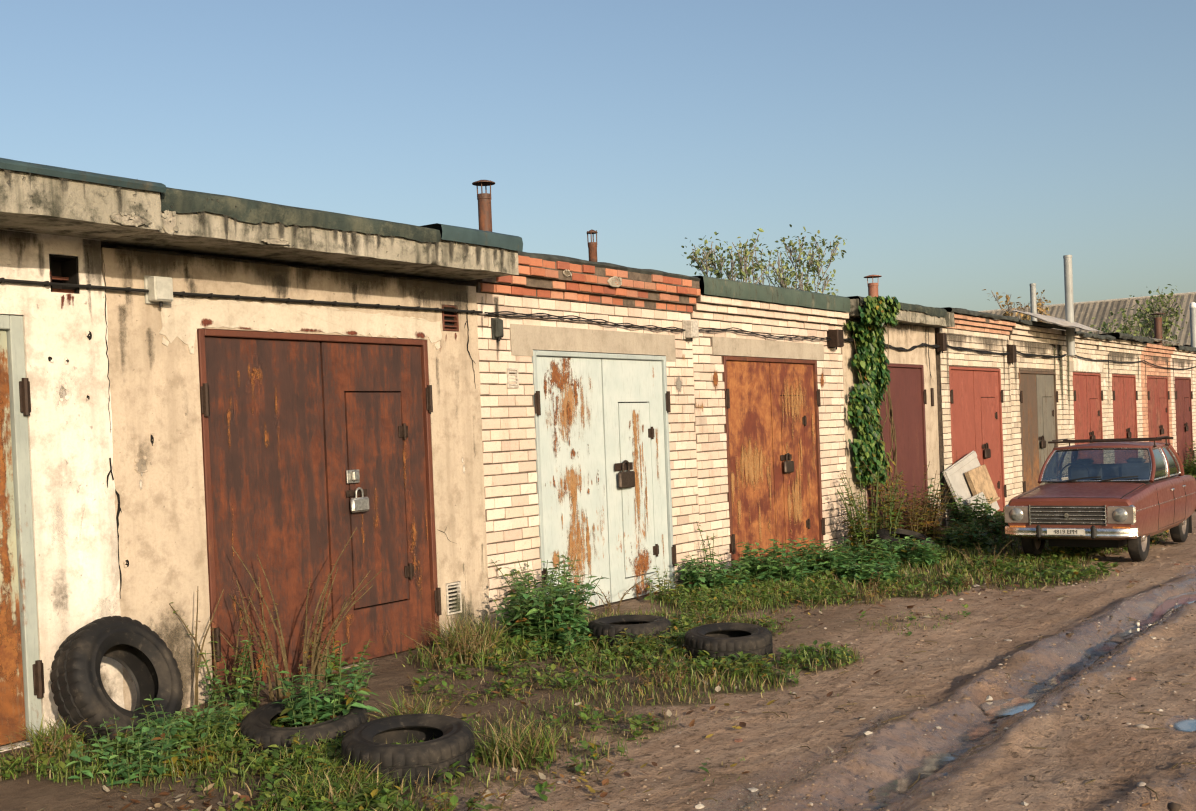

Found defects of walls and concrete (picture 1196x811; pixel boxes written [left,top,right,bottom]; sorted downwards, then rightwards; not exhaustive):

leakage [0,230,43,271]
leakage [83,239,102,283]
leakage [117,246,499,330]
leakage [334,229,394,249]
leakage [427,241,515,265]
rust [227,365,262,447]
rust [0,398,20,683]
rust [409,518,428,598]
rust [544,357,602,592]
rust [627,410,665,597]
rust [731,439,772,542]
rust [779,378,815,530]